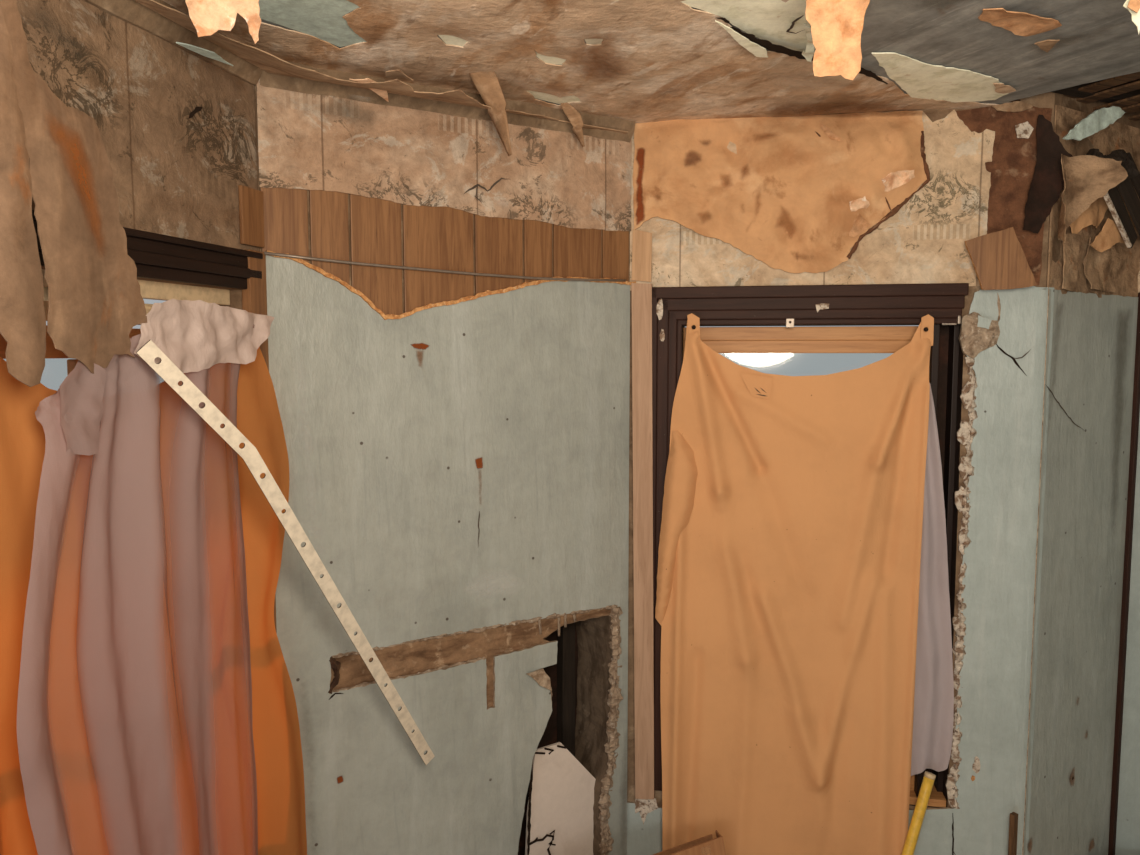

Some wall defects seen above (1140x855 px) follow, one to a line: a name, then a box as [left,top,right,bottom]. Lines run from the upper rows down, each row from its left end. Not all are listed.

peeling [258,0,366,47]
peeling [439,35,469,47]
peeling [535,51,566,65]
peeling [681,0,816,63]
peeling [527,90,580,104]
peeling [872,52,1034,139]
rust [412,343,429,363]
crack [996,293,1086,432]
spalling [946,357,980,809]
spalling [517,622,578,855]
spalling [598,607,624,855]
crack [949,813,957,855]